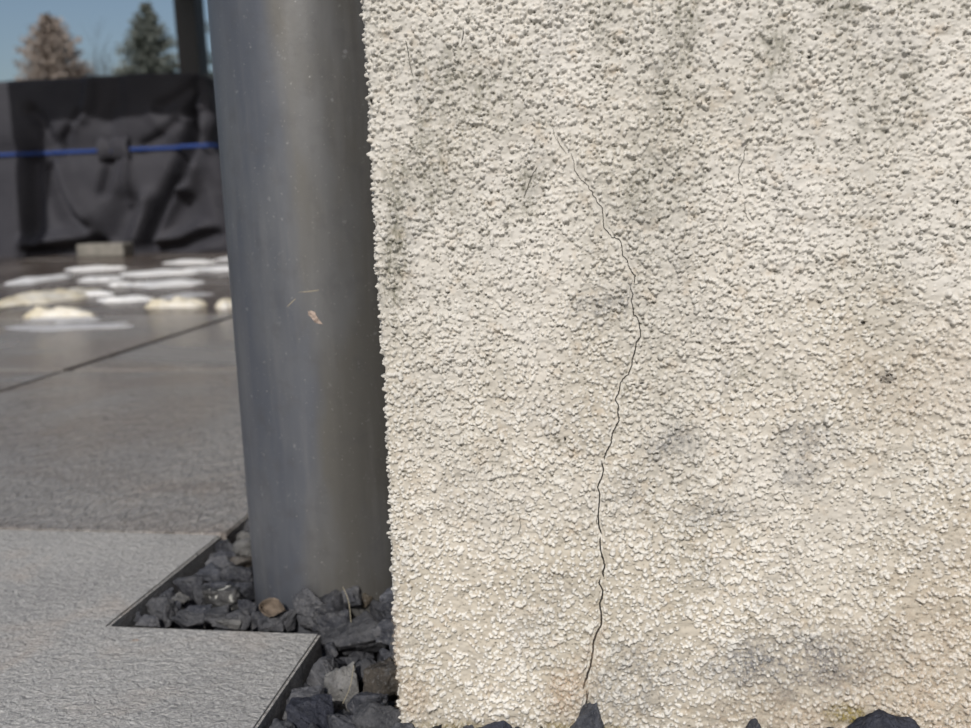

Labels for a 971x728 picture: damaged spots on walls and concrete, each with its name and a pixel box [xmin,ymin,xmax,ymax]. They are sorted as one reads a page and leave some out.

crack [550,125,641,704]